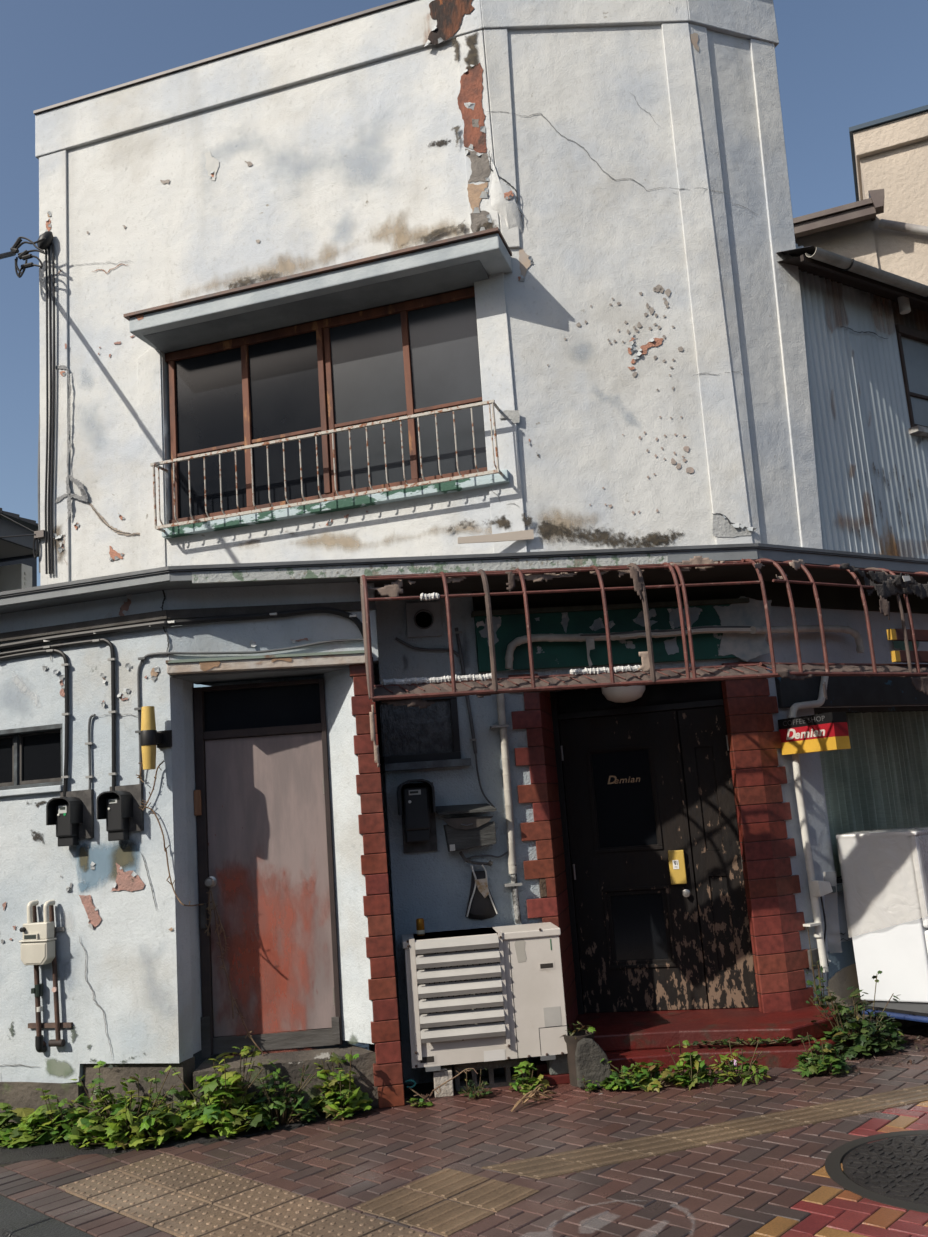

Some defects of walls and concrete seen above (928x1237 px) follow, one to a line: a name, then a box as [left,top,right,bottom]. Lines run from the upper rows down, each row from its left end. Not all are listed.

spalling [424,0,474,47]
spalling [457,63,492,232]
crack [489,151,524,226]
crack [490,111,758,215]
water stain [376,220,496,248]
water stain [229,258,307,289]
spalling [607,284,683,391]
crack [55,365,140,536]
water stain [306,534,360,548]
water stain [448,512,681,548]
peeling [60,876,102,929]
crack [79,937,113,1062]